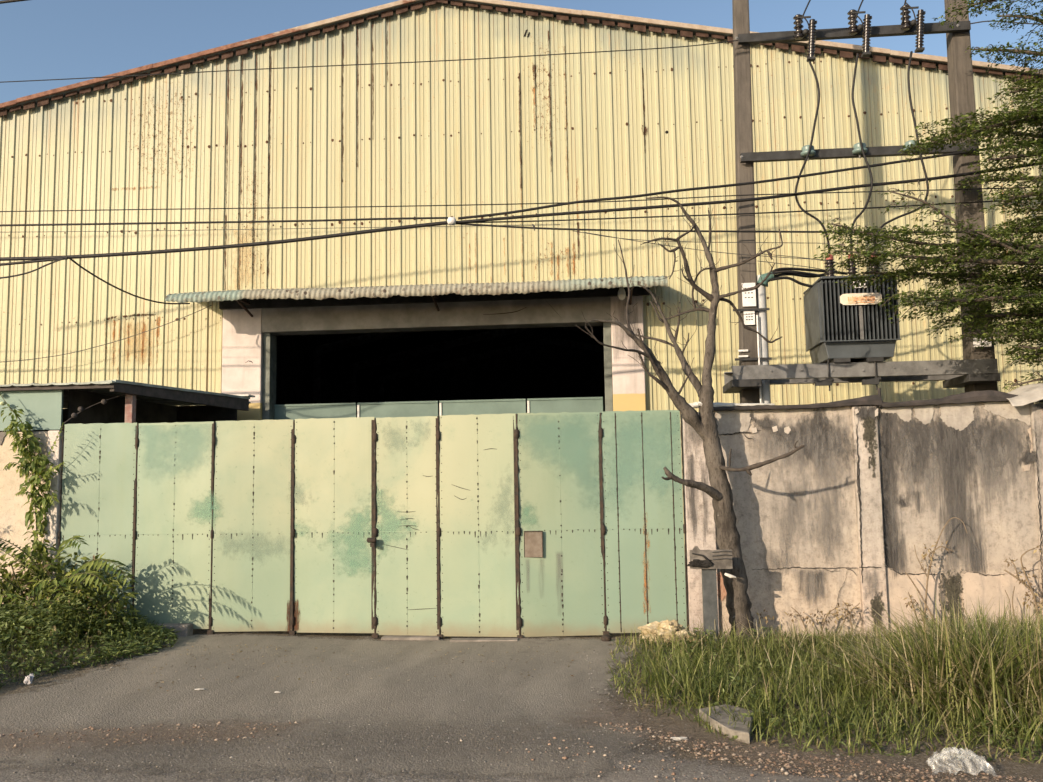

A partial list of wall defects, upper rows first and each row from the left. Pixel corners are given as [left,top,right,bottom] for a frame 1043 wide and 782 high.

corrosion [113,81,204,190]
corrosion [224,51,282,290]
corrosion [519,31,567,207]
corrosion [522,152,586,279]
corrosion [105,314,161,373]
flaking render [715,410,757,435]
water stain [750,409,854,481]
crack [753,425,938,610]
water stain [867,412,1037,575]
flaking render [875,401,1034,471]
crack [964,432,1043,591]
corrosion [287,600,300,632]